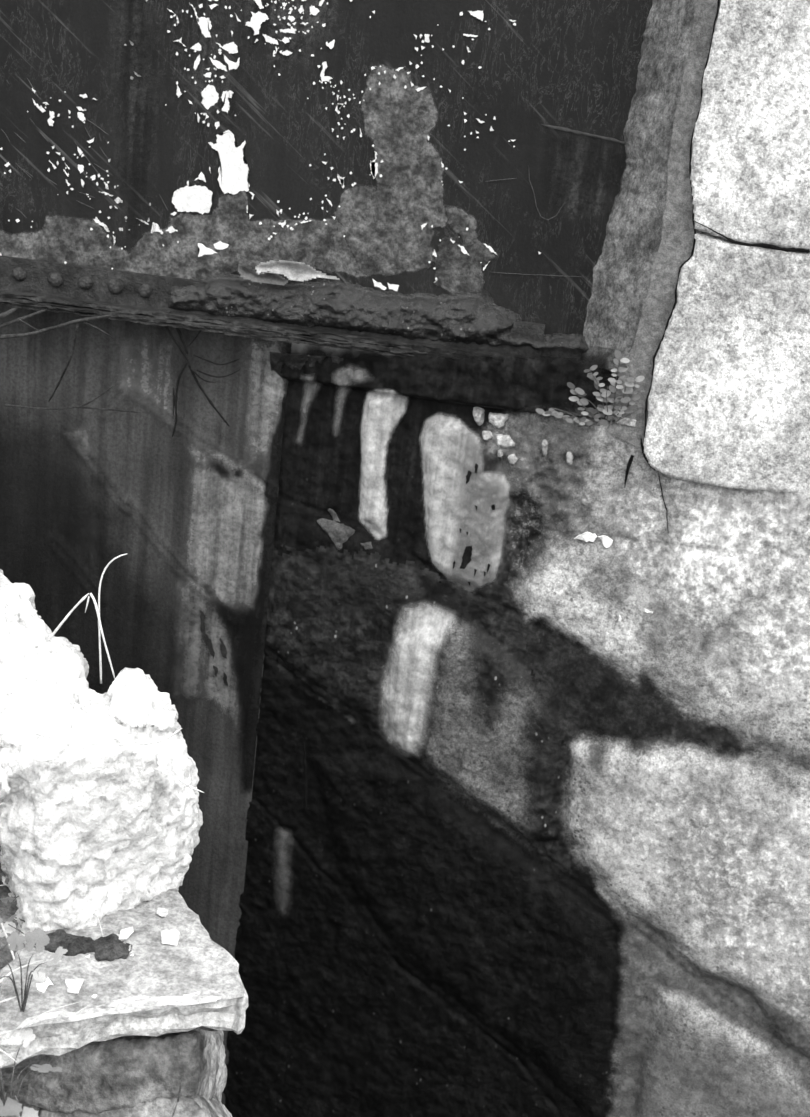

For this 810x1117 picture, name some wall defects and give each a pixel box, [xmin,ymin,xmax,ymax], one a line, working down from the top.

peeling [27,88,96,128]
peeling [47,0,496,249]
rust [0,64,589,354]
peeling [198,241,229,257]
peeling [372,279,399,291]
peeling [421,223,496,283]
crack [624,0,810,530]